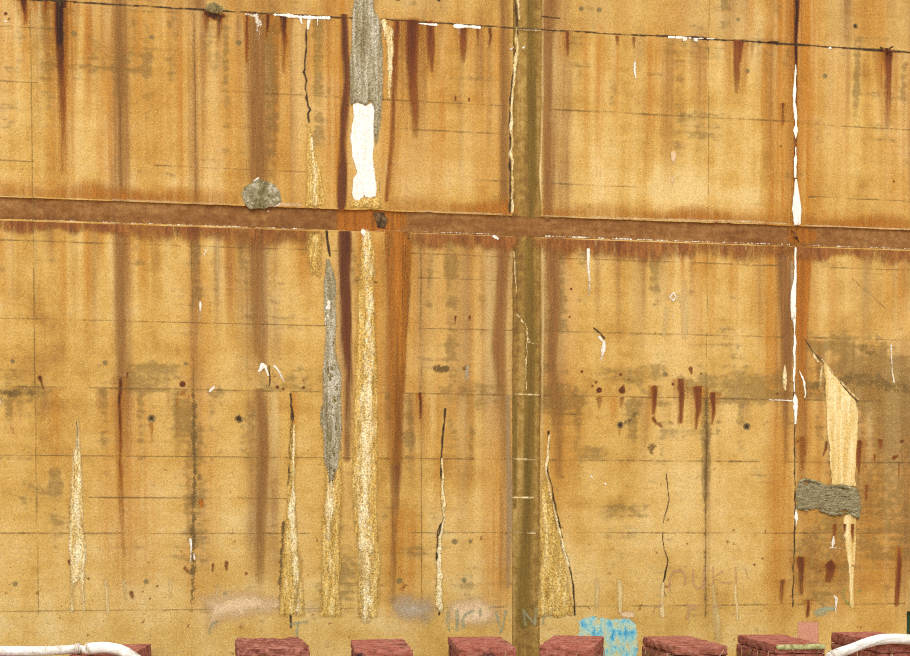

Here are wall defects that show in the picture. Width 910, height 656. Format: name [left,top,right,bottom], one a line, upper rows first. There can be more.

corrosion [265,14,288,62]
corrosion [336,14,518,508]
crack [516,314,533,390]
corrosion [650,385,662,427]
corrosion [672,367,718,429]
crack [435,408,446,615]